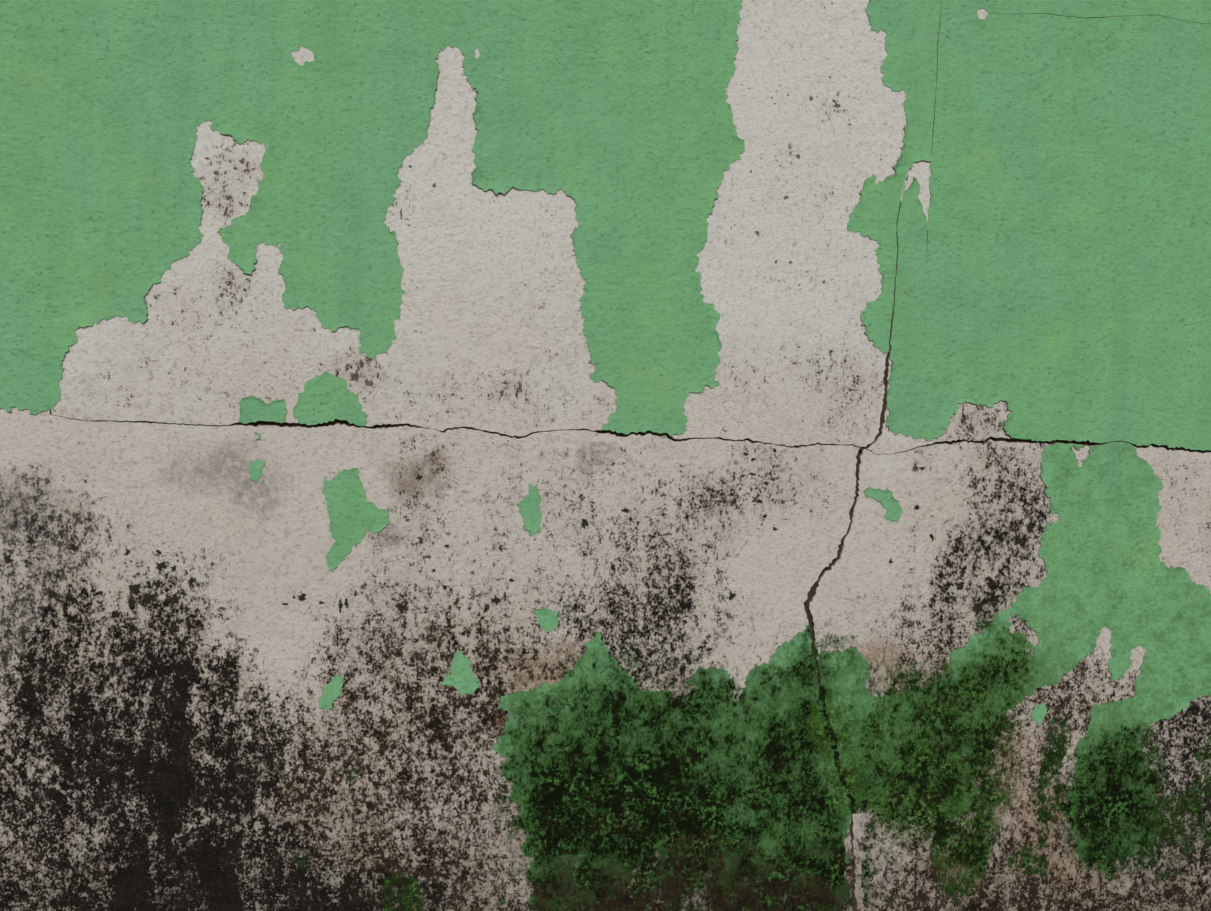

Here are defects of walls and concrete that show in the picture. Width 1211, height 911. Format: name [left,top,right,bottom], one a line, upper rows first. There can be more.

peeling [51,45,619,436]
peeling [671,0,1011,454]
peeling [0,406,1060,911]
water stain [0,444,1211,911]
crack [50,202,1211,704]
crack [849,813,858,911]
peeling [843,627,1211,911]
peeling [1068,443,1106,468]
peeling [1134,445,1211,594]